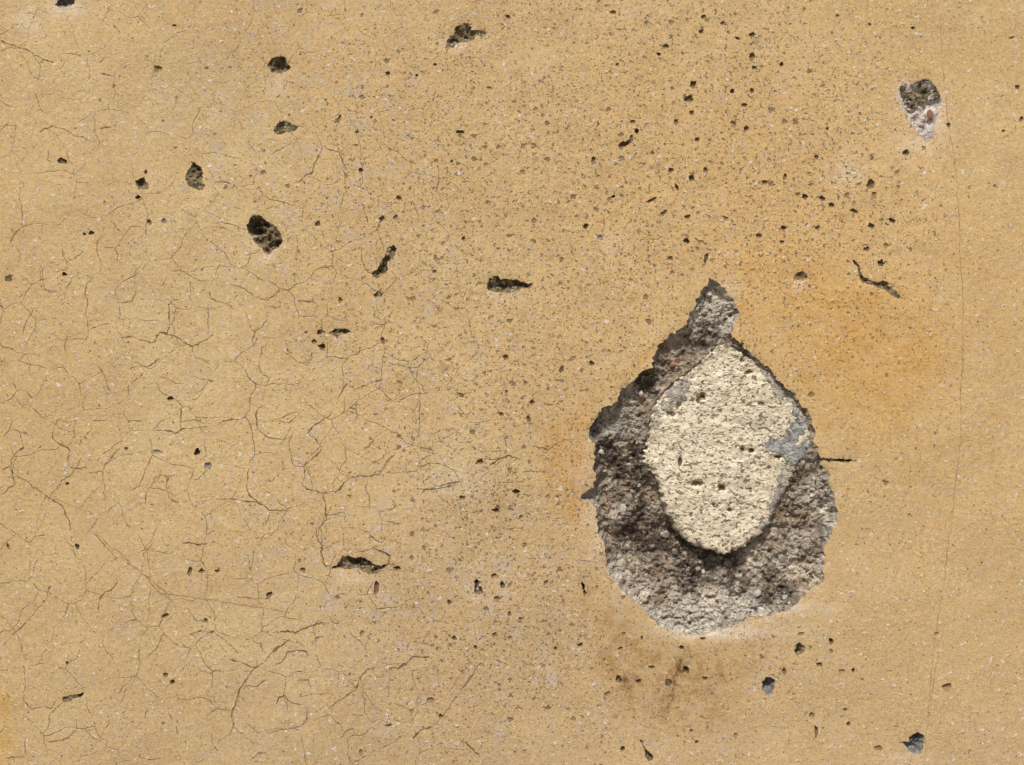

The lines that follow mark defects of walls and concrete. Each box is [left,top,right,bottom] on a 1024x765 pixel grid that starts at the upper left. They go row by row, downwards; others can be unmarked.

crack [1,30,113,162]
peeling [897,79,943,143]
crack [295,131,368,222]
crack [0,266,57,403]
spalling [246,214,283,255]
crack [853,260,901,299]
crack [1,419,117,529]
crack [118,265,570,568]
spalling [580,278,838,636]
spalling [332,555,387,574]
crack [97,538,487,758]
crack [6,719,98,759]